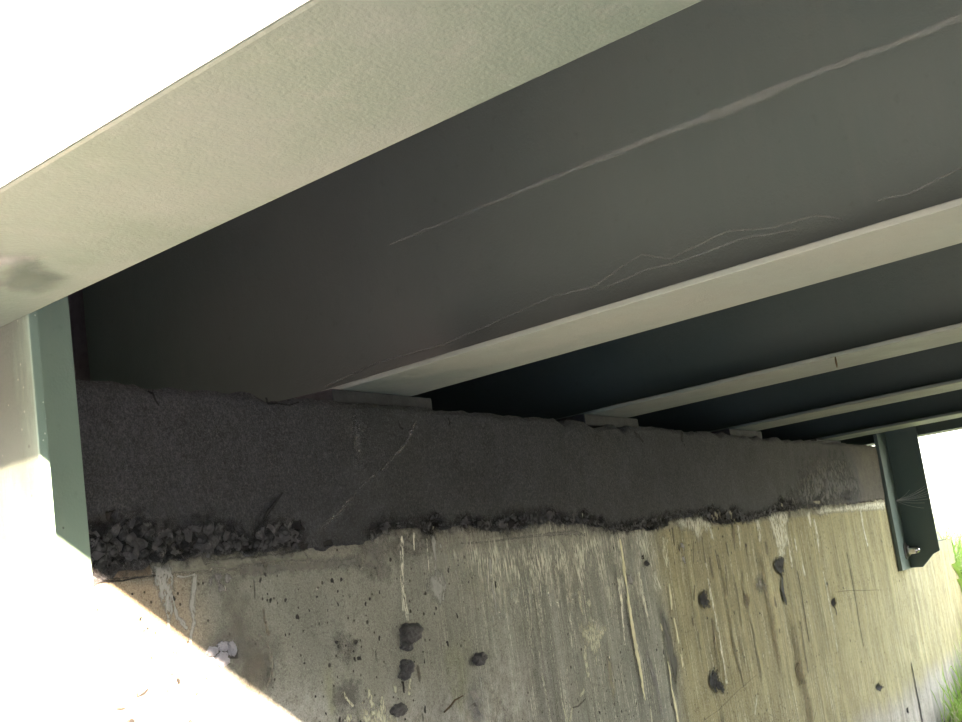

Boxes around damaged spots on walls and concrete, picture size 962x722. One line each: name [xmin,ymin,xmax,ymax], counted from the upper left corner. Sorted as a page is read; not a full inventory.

spalling [88,510,310,587]